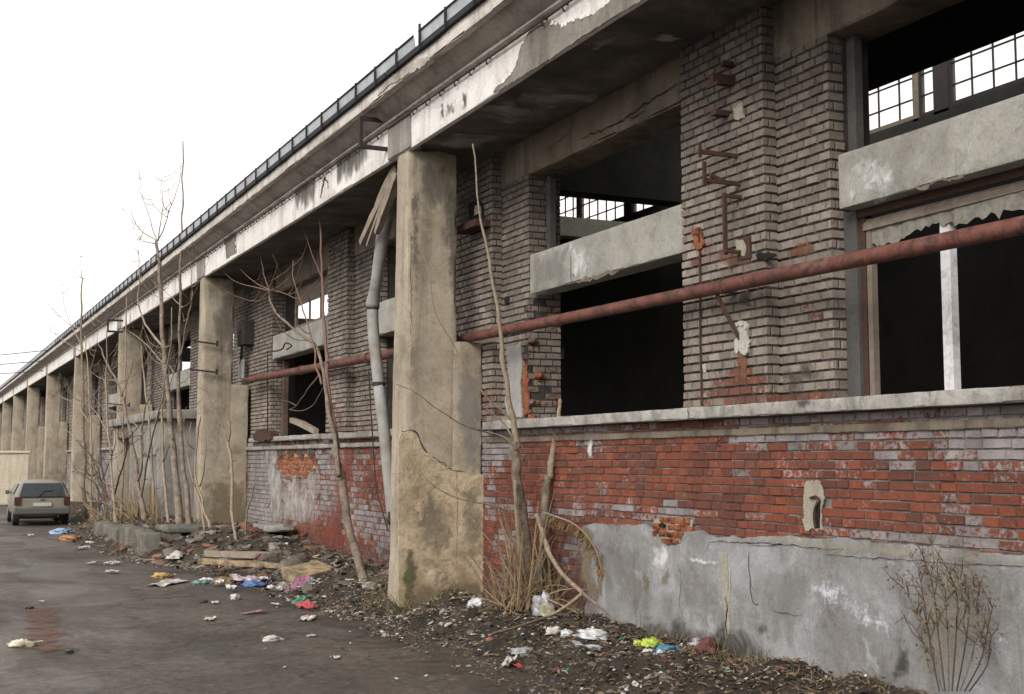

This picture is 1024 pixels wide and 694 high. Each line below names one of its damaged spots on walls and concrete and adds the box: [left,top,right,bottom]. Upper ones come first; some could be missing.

peeling [493,0,642,92]
crack [549,84,677,149]
spalling [252,430,318,479]
crack [402,430,464,473]
leakage [266,444,342,548]
spalling [652,516,694,545]
crack [714,541,1024,639]